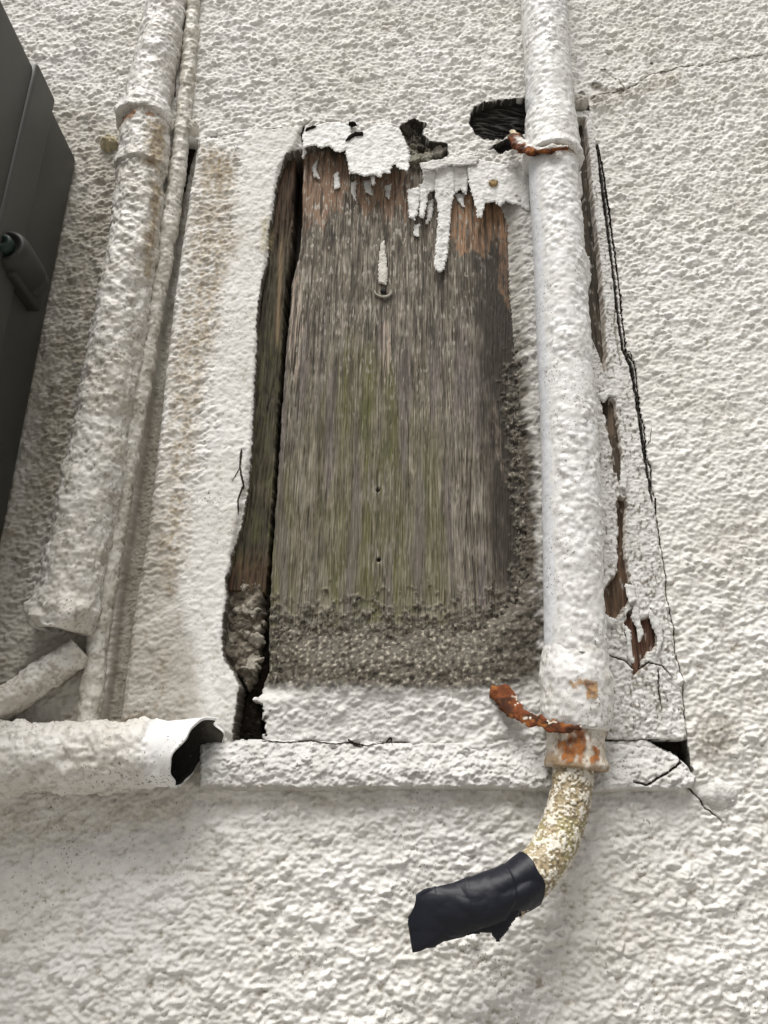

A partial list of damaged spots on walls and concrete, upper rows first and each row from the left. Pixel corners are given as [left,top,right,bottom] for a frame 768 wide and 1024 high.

crack [591,53,768,100]
peeling [302,121,531,272]
peeling [598,388,664,675]
crack [596,144,722,822]
flaking render [225,580,267,693]
crack [239,581,410,747]
rust [558,730,600,763]
rust [571,679,598,699]